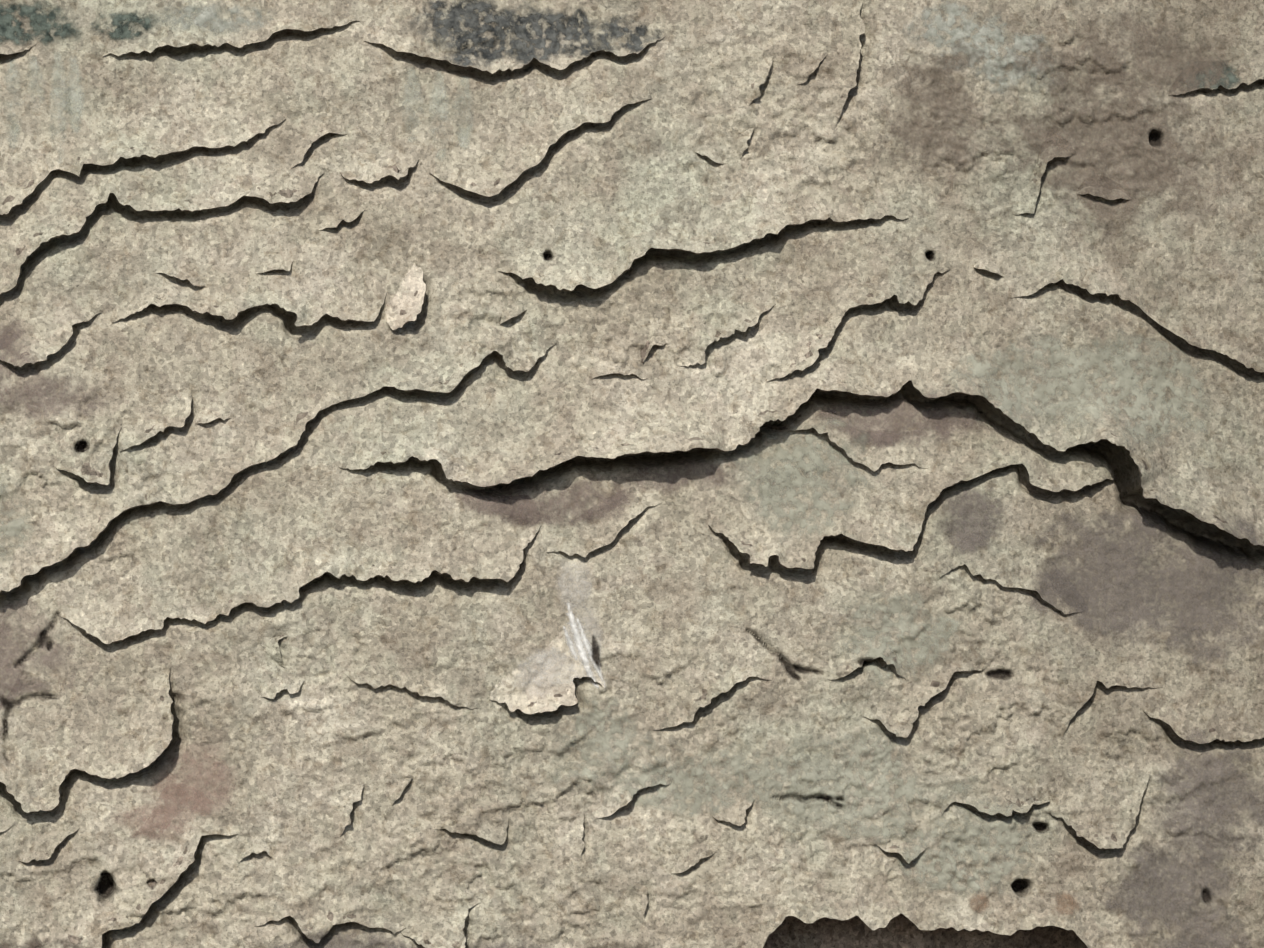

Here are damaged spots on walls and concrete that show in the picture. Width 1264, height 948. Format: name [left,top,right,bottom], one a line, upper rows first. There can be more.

peeling [0,0,1264,644]
crack [19,613,58,665]
peeling [0,638,175,813]
peeling [345,624,605,715]
peeling [653,631,772,730]
crack [748,630,816,678]
peeling [827,612,989,738]
peeling [1058,648,1264,744]
peeling [18,812,80,863]
peeling [36,784,481,948]
peeling [434,798,509,845]
peeling [940,742,1151,850]